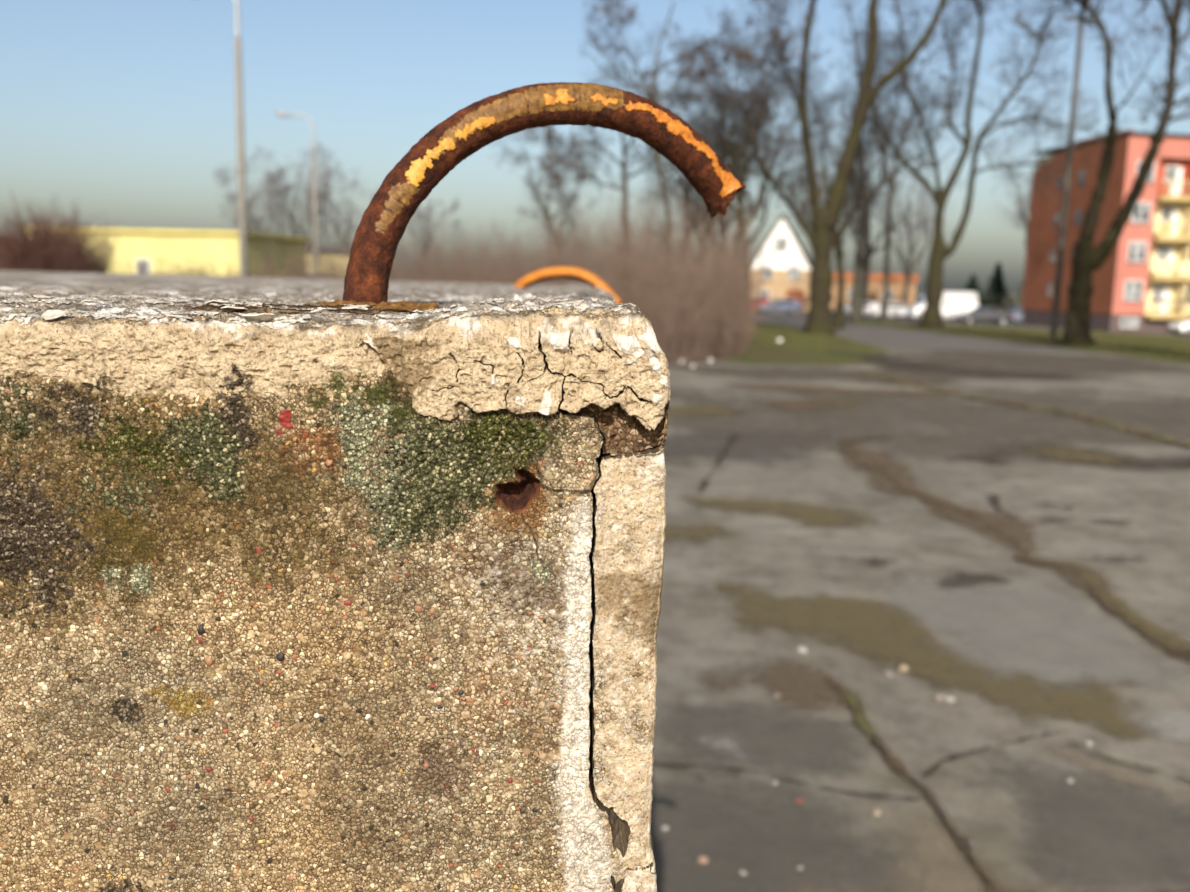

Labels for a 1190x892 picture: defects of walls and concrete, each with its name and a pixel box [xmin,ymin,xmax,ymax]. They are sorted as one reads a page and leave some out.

peeling [548,332,570,352]
spalling [565,333,669,455]
crack [862,371,1190,447]
crack [432,328,665,857]
crack [836,436,1190,657]
crack [654,676,1190,892]